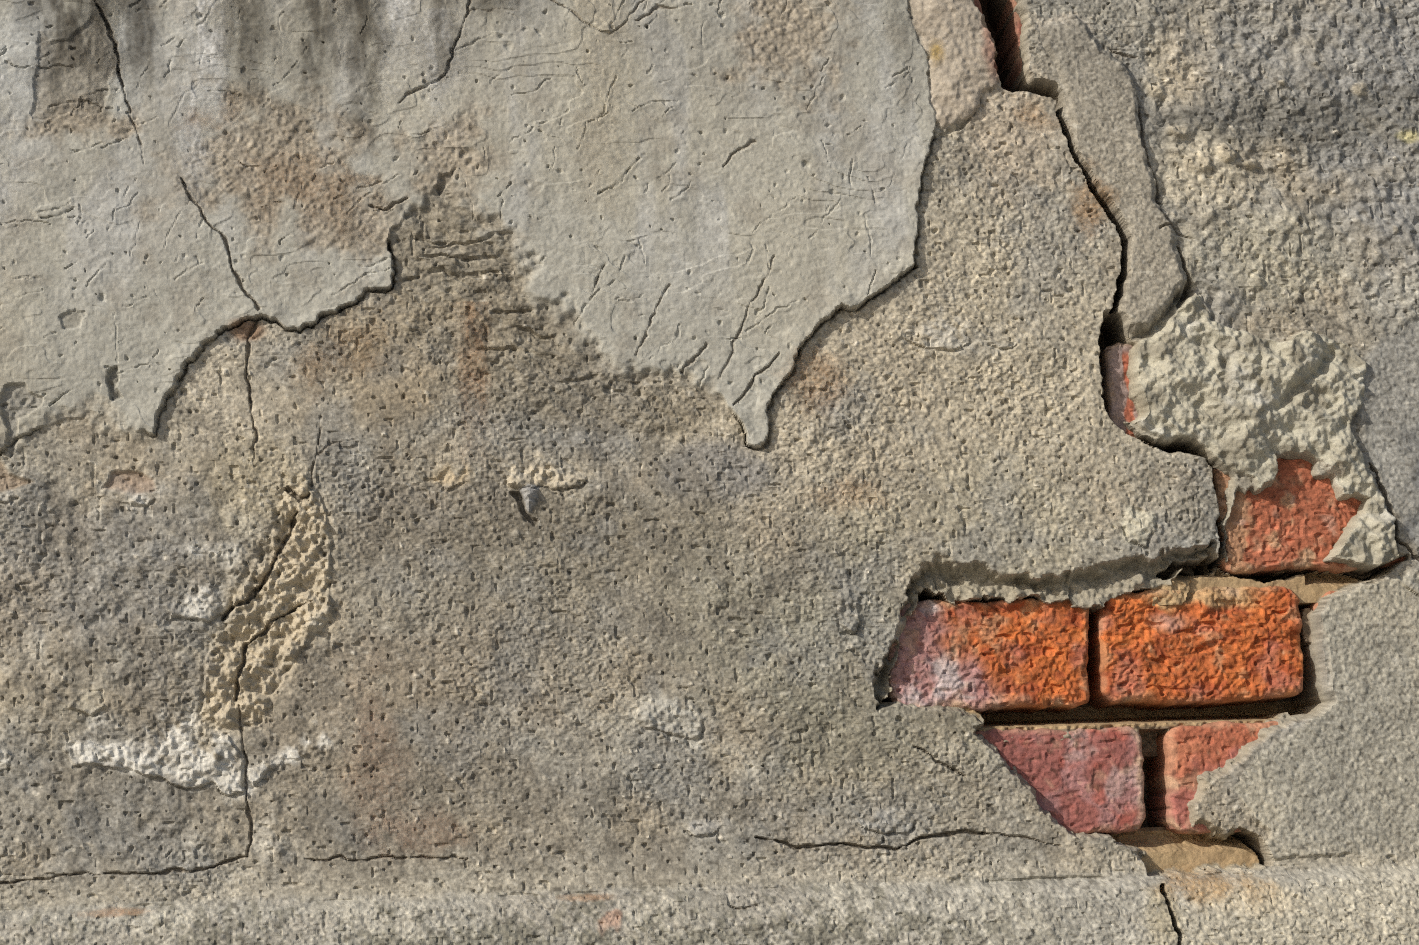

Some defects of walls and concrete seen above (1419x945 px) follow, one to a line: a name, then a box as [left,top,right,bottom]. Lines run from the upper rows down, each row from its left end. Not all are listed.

damp [45,0,87,69]
crack [92,0,146,166]
damp [186,0,258,157]
damp [301,0,328,73]
damp [347,0,411,67]
crack [180,177,262,463]
crack [971,0,1419,584]
peeling [732,96,1419,881]
crack [0,415,357,886]
crack [754,829,1063,853]
crack [1159,883,1185,945]
crack [1230,828,1274,868]